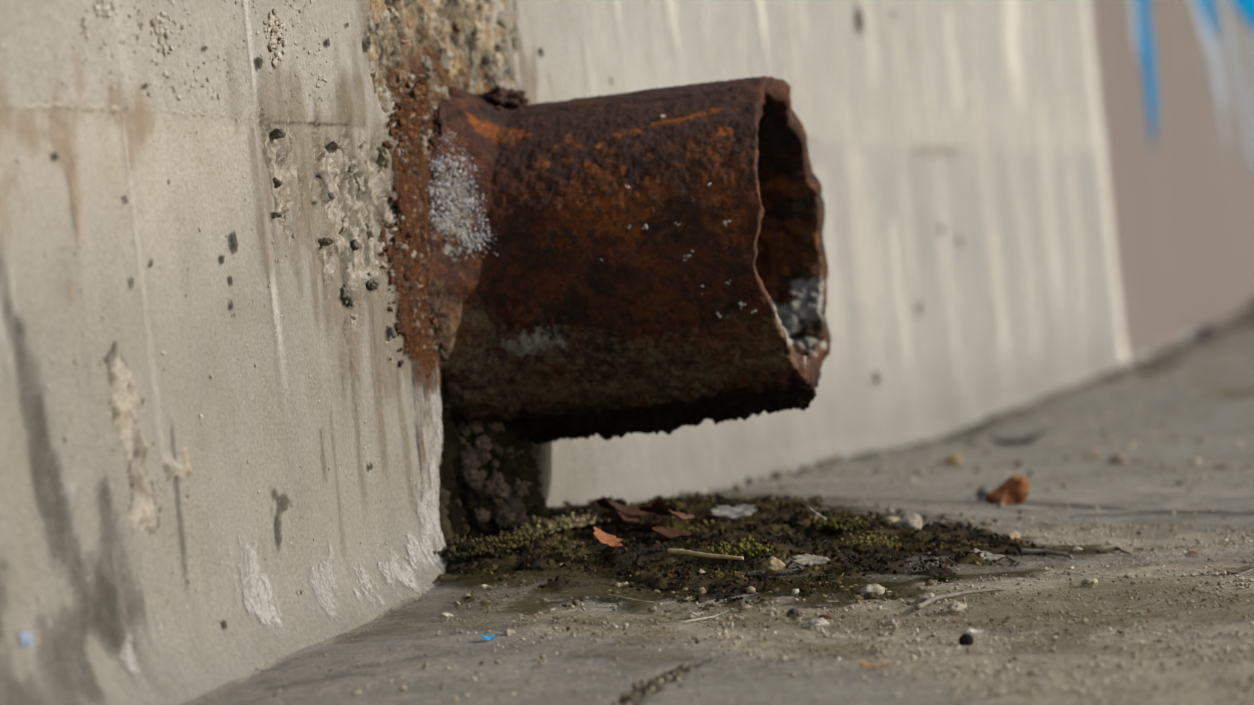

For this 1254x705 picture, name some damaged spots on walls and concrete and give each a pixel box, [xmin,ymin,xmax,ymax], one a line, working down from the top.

water stain [0,236,138,672]
corrosion [380,54,450,469]
spalling [362,0,521,128]
corrosion [483,86,530,111]